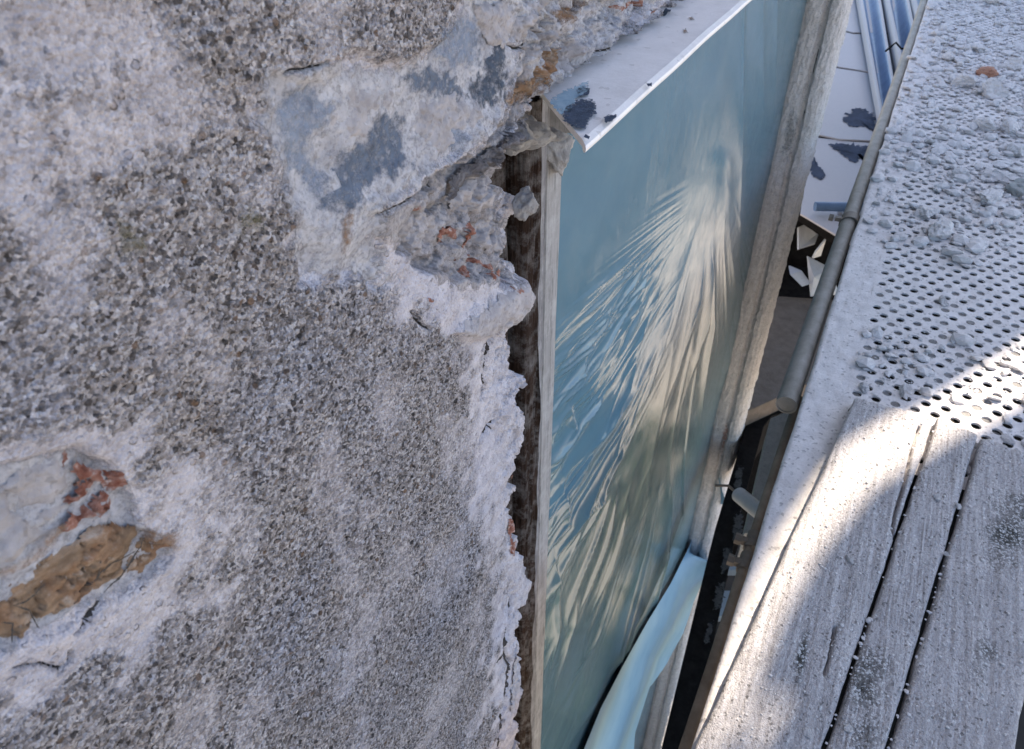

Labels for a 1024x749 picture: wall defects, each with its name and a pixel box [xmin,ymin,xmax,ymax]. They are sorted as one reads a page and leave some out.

spalling [257,0,671,294]
spalling [0,449,173,651]
spalling [507,519,516,557]